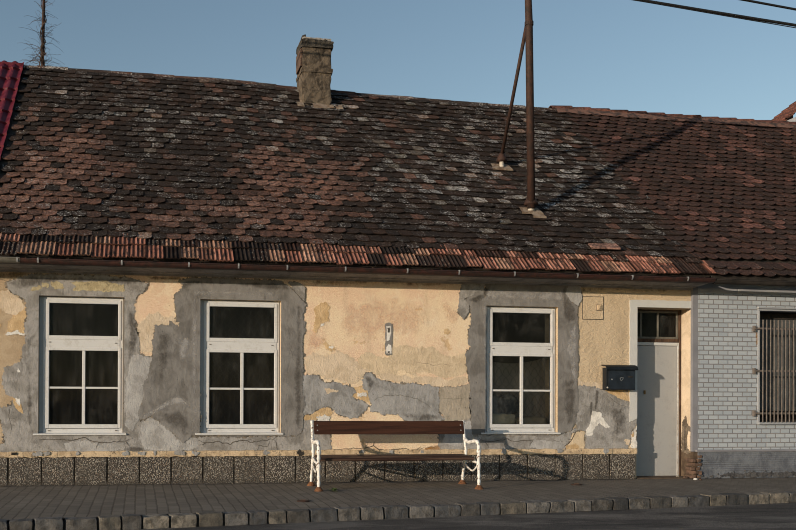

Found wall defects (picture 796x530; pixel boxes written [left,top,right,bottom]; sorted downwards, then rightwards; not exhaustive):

flaking render [0,273,637,457]